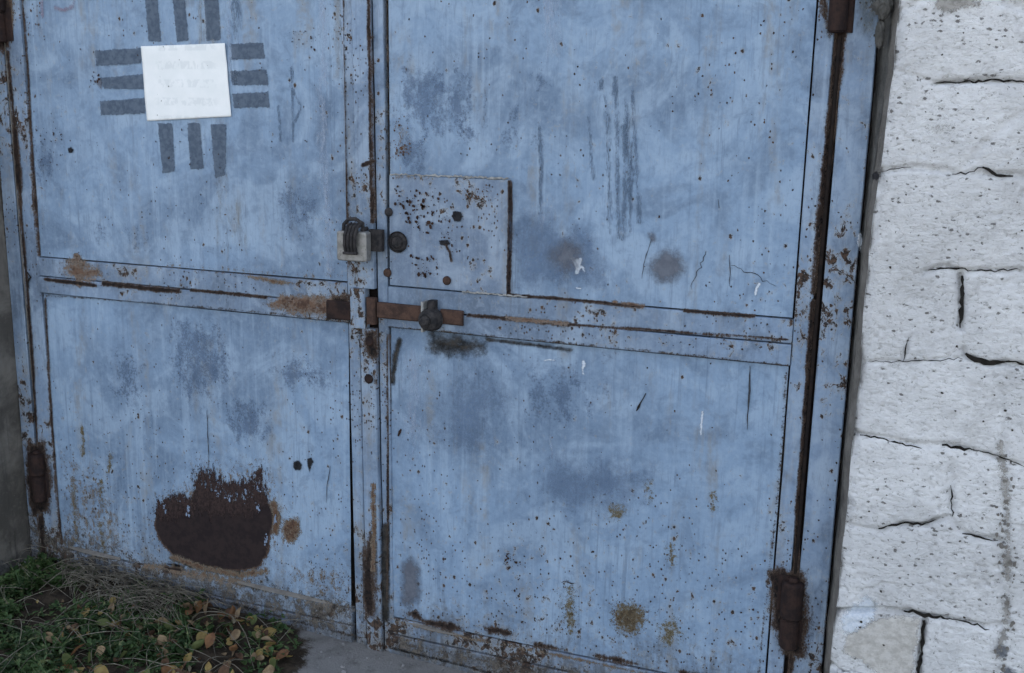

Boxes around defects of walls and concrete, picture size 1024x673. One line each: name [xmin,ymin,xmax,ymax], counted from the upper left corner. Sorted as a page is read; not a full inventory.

corrosion [0,0,353,577]
corrosion [361,0,411,224]
corrosion [130,327,695,673]
corrosion [391,175,463,252]
corrosion [462,0,847,673]